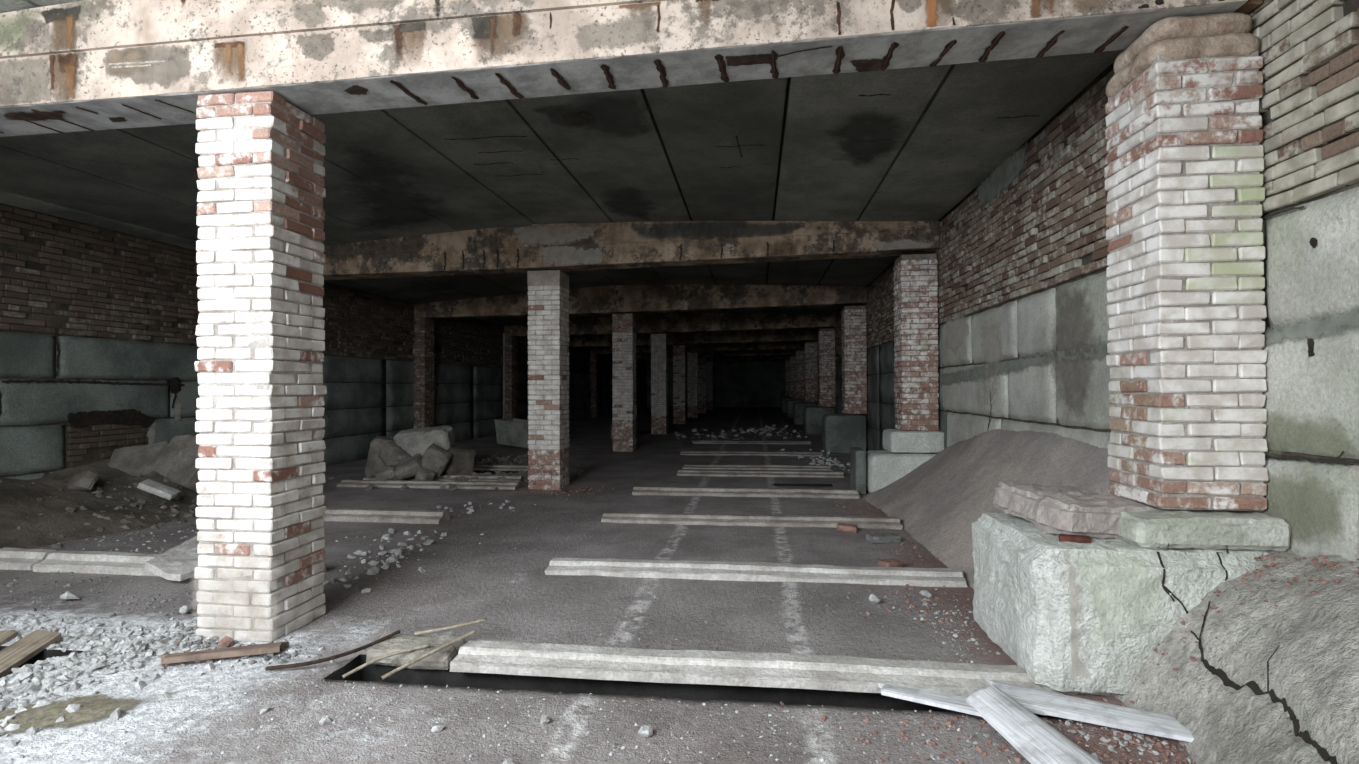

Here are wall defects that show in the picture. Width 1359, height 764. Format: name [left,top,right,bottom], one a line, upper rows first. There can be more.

rust [926,0,950,27]
rust [1031,0,1053,18]
rust [394,22,425,54]
rust [49,53,78,98]
rust [214,41,245,80]
water stain [833,114,898,163]
crack [1156,543,1338,764]